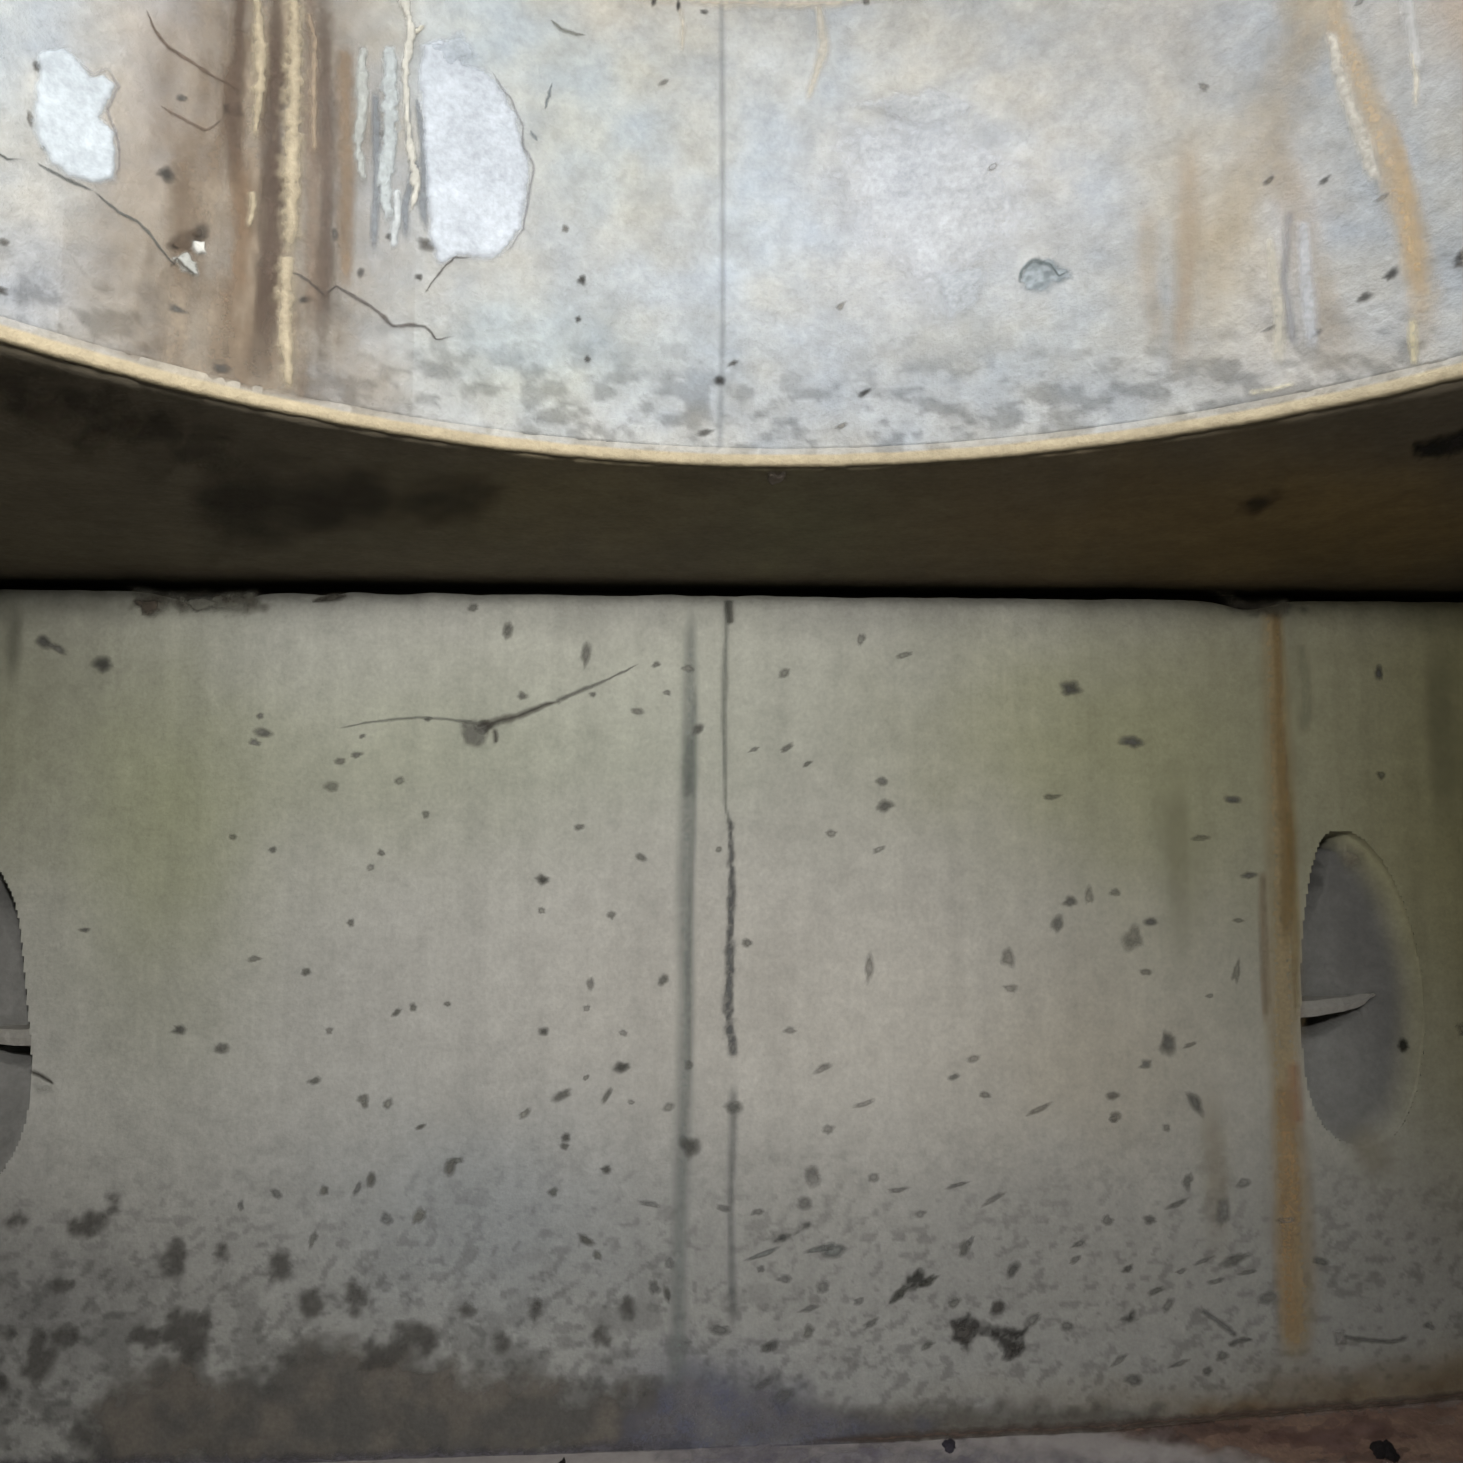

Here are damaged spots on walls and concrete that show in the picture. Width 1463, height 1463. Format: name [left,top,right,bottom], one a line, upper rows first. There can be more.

peeling [35,49,119,181]
corrosion [158,0,350,396]
peeling [420,38,534,262]
crack [347,666,634,745]
damp [723,601,733,772]
damp [724,796,736,1054]
damp [70,1200,117,1237]
damp [24,1329,78,1380]
damp [72,1223,1153,1463]